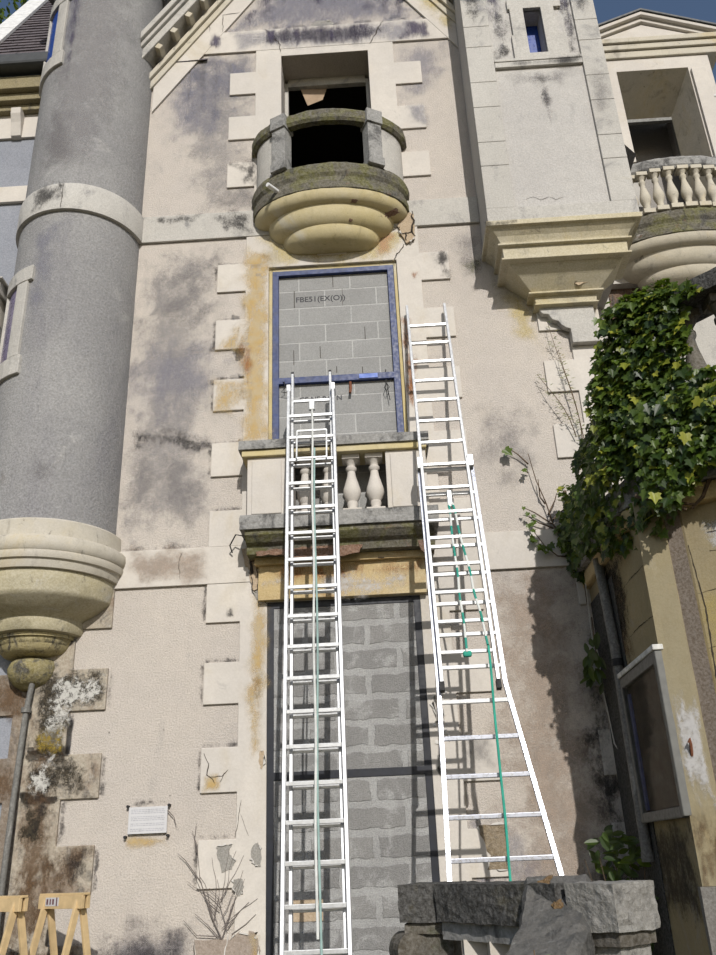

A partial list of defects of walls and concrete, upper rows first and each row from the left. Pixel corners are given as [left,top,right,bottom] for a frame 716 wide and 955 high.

crack [394,211,415,260]
leakage [138,434,207,450]
crack [688,531,716,677]
leakage [13,748,82,935]